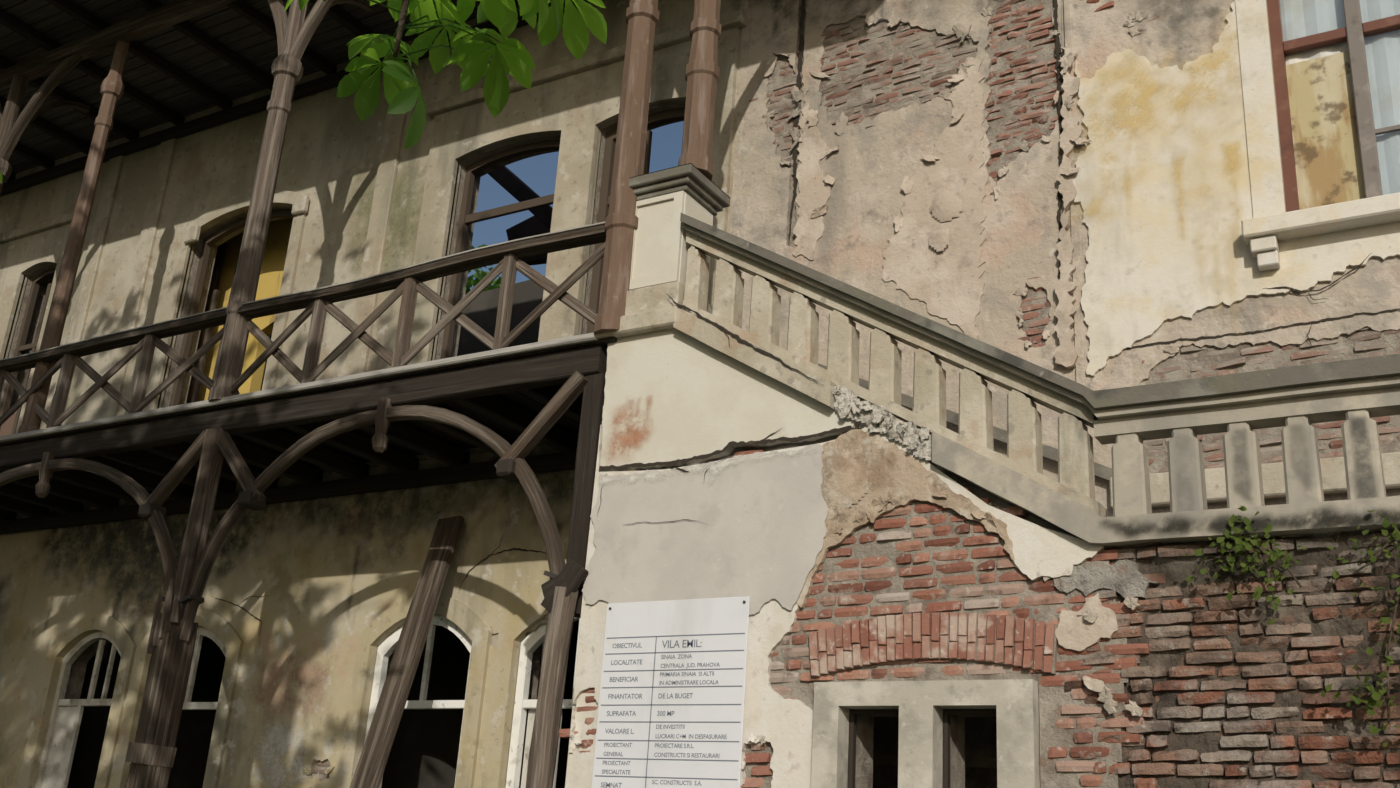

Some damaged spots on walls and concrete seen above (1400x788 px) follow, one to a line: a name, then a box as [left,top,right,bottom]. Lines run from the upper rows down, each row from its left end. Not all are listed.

peeling [749,0,1092,369]
spalling [1138,327,1400,386]
corrosion [612,413,647,453]
crack [597,426,852,525]
spalling [831,385,932,460]
spalling [1253,426,1285,464]
spalling [1371,415,1400,453]
damp [207,472,573,572]
damp [43,510,188,613]
spalling [769,487,1400,788]
spalling [559,688,598,753]
spalling [741,734,773,788]